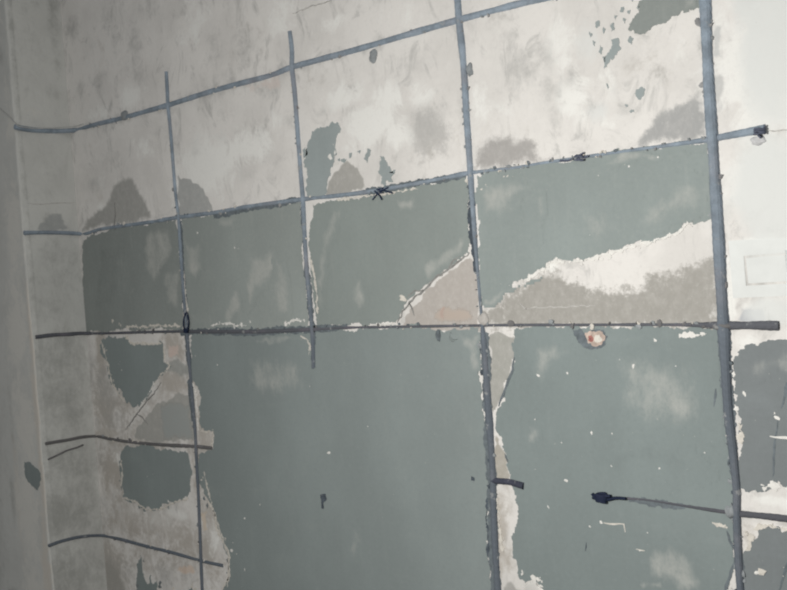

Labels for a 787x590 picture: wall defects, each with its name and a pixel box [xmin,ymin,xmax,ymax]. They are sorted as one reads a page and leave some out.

peeling [589,0,699,68]
peeling [82,122,711,590]
peeling [495,326,787,590]